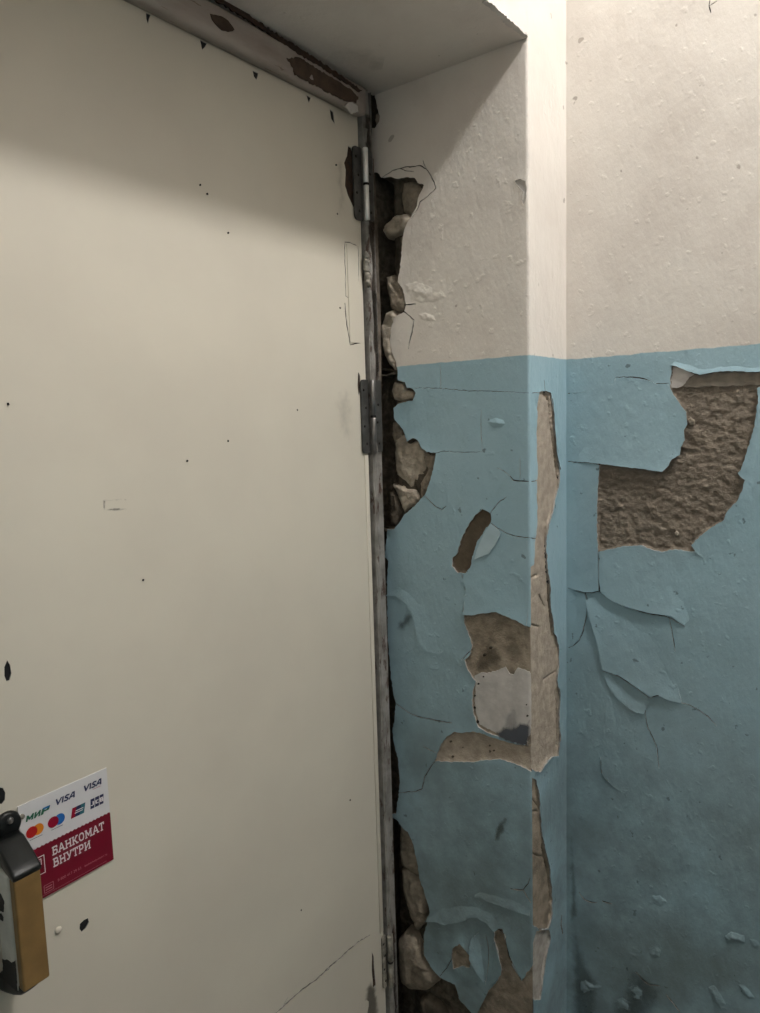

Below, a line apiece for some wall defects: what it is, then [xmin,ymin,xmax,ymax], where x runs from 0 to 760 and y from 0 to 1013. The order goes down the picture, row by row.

spalling [374,173,436,531]
spalling [397,361,760,1013]